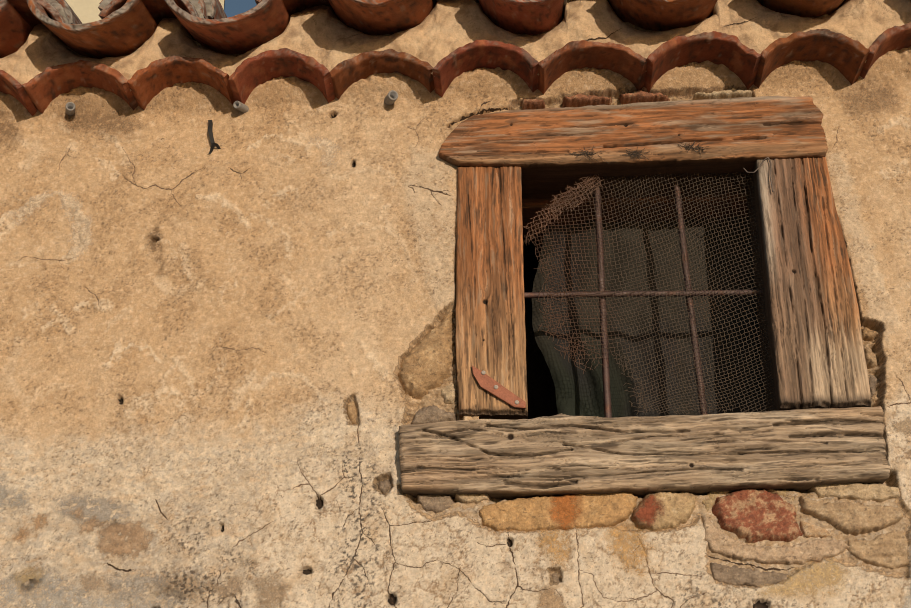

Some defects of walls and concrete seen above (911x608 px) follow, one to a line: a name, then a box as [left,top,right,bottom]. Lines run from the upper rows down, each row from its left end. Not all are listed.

crack [449,100,510,128]
crack [122,147,203,206]
flaking render [394,301,464,425]
flaking render [860,317,886,407]
flaking render [343,395,359,425]
crack [294,403,795,608]
flaking render [333,448,911,608]